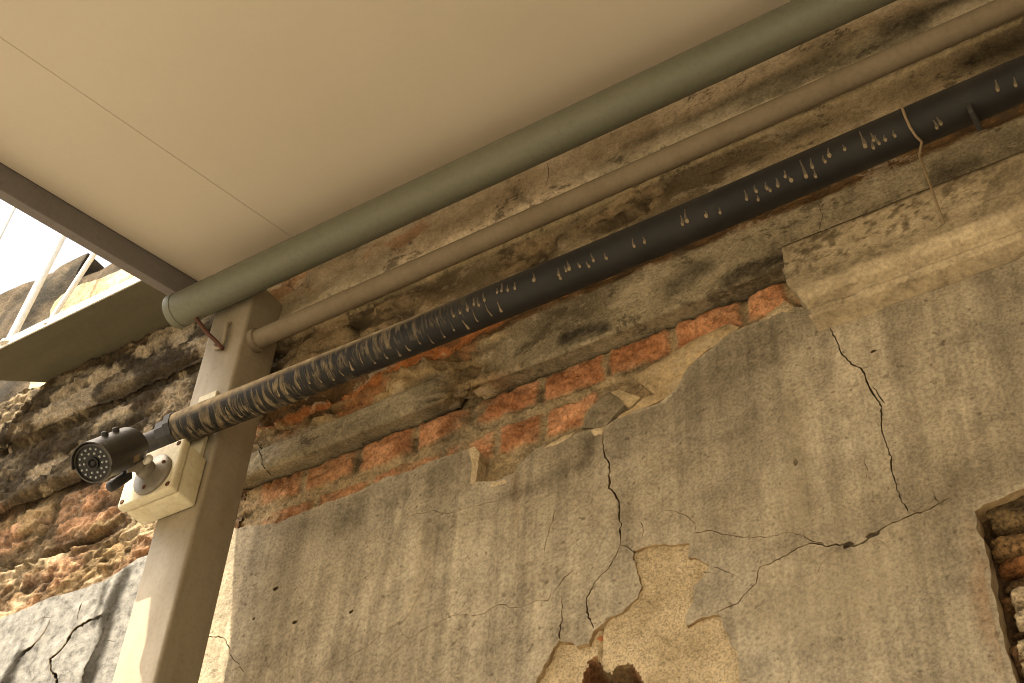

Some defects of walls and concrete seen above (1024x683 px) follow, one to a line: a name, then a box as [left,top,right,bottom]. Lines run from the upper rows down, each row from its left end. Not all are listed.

damp [560,325,607,342]
spalling [0,313,215,619]
flaking render [234,283,803,528]
crack [603,445,644,566]
crack [677,329,949,608]
crack [19,606,110,683]
crack [559,585,594,640]
flaking render [540,545,741,683]
spalling [985,495,1024,680]